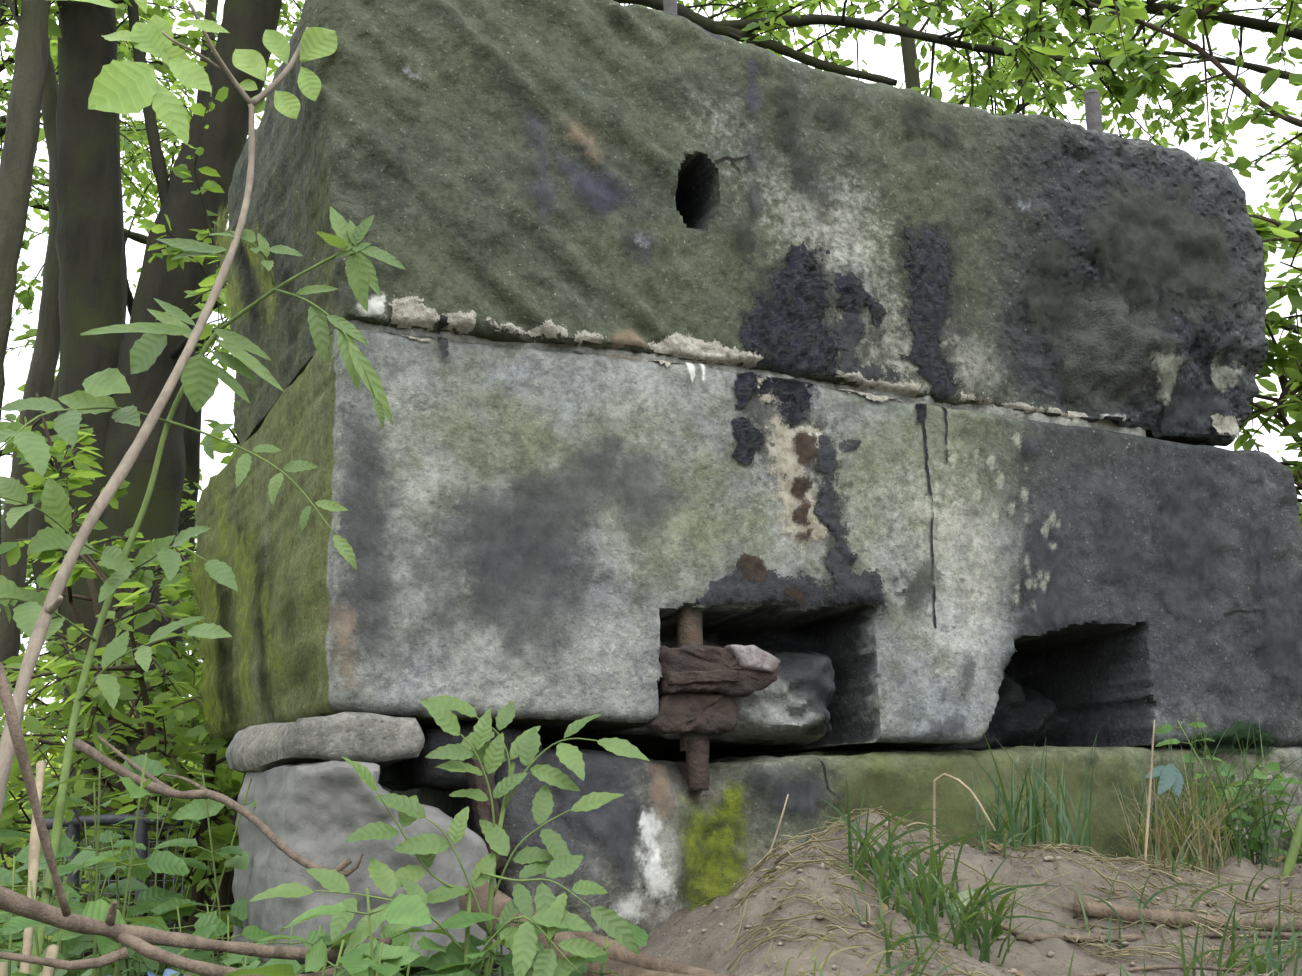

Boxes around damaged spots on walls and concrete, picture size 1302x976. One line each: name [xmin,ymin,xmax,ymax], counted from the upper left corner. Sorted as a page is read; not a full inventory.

peeling [834,271,887,329]
spalling [357,295,827,545]
water stain [731,219,970,580]
spalling [835,370,921,402]
spalling [959,391,1126,421]
water stain [915,399,948,628]
spalling [686,553,889,616]
spalling [900,560,943,606]